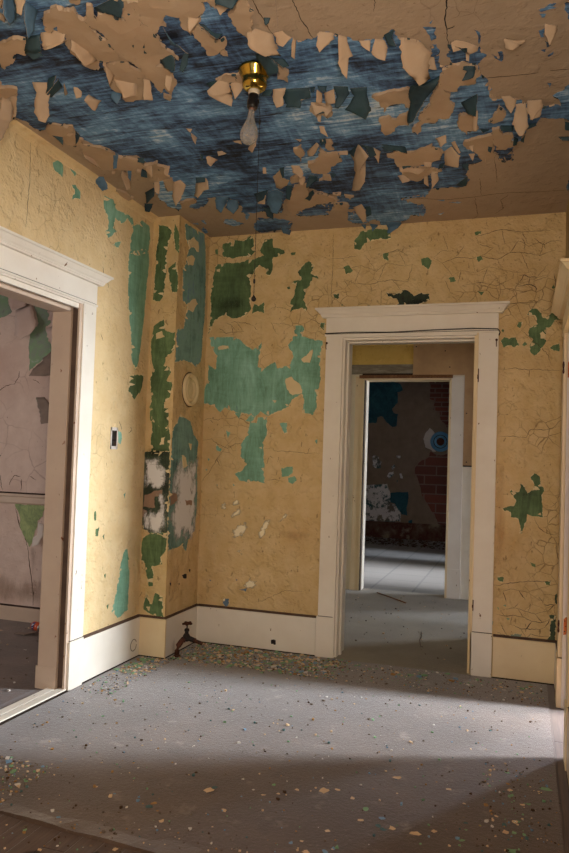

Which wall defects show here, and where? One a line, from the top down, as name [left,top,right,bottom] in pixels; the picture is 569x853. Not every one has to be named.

crack [444,0,454,43]
crack [417,159,559,304]
peeling [0,0,569,618]
crack [16,512,34,595]
crack [497,580,557,638]
peeling [547,615,557,640]